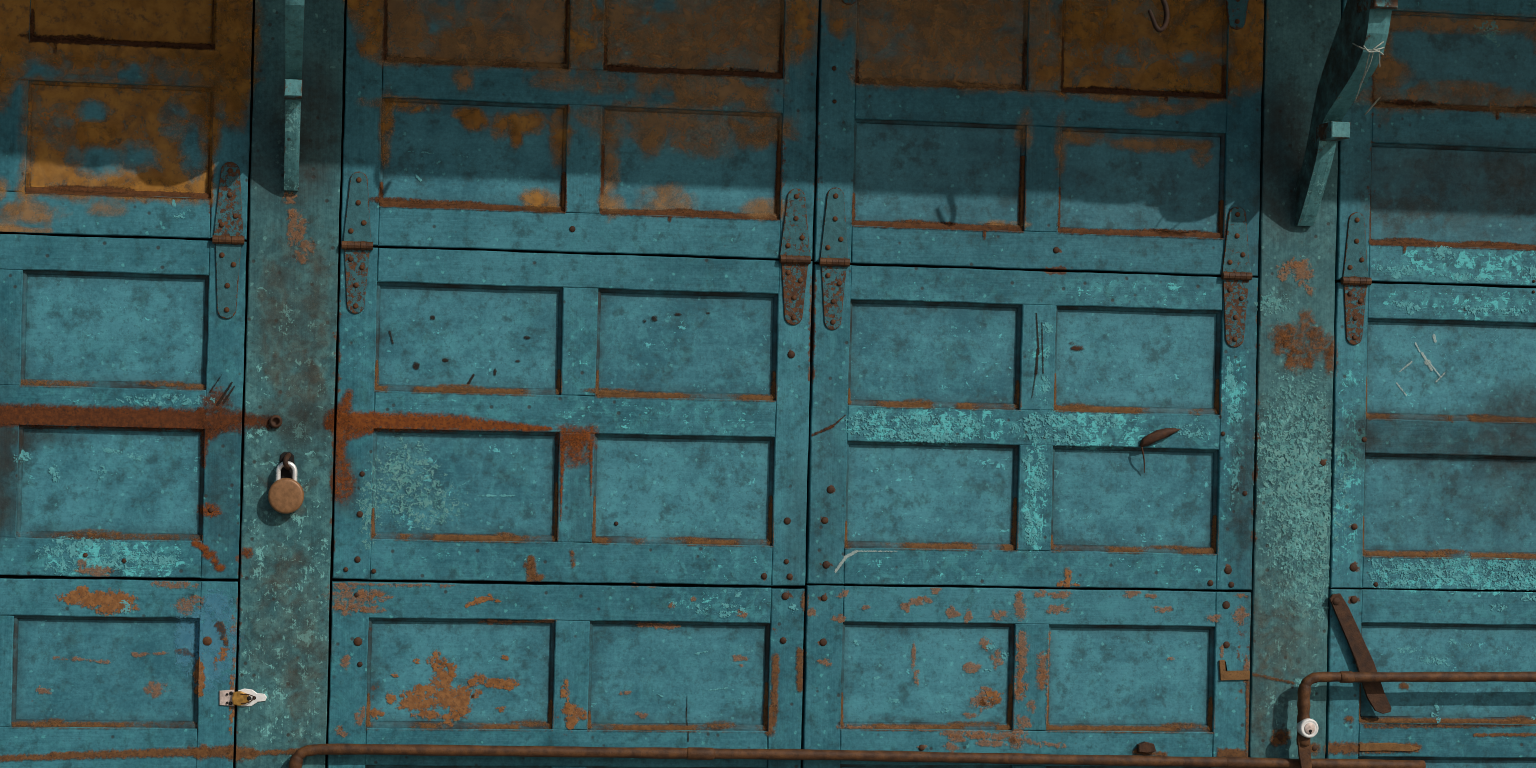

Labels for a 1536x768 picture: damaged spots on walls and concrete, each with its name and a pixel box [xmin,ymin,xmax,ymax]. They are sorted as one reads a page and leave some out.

corrosion [20,0,217,54]
corrosion [603,24,786,79]
corrosion [1061,37,1229,101]
corrosion [25,146,213,200]
corrosion [370,172,567,213]
corrosion [599,130,783,222]
corrosion [1269,311,1338,372]
corrosion [0,380,273,468]
peeling [844,322,1122,546]
peeling [1368,555,1536,612]
corrosion [412,700,554,731]
corrosion [863,684,1014,732]